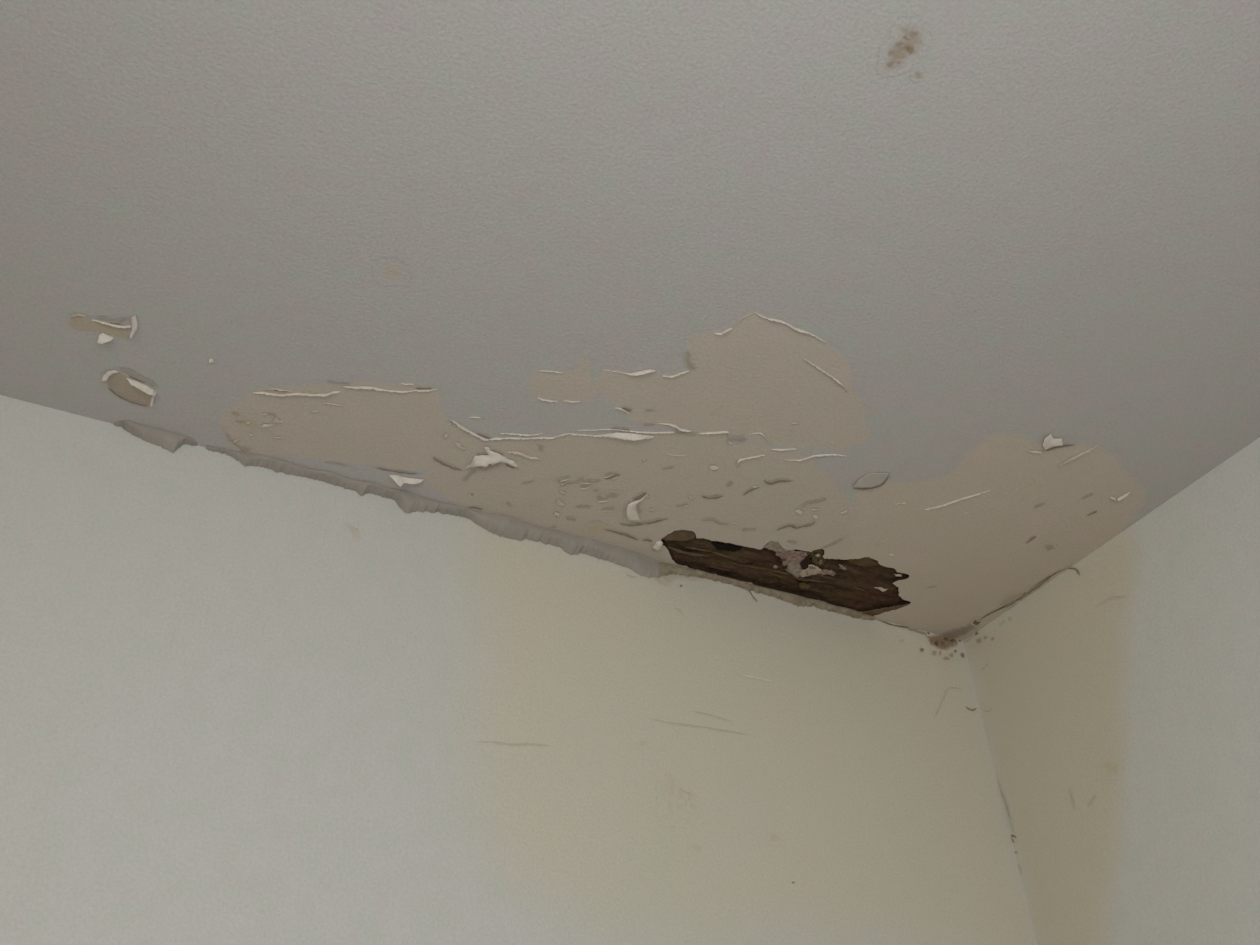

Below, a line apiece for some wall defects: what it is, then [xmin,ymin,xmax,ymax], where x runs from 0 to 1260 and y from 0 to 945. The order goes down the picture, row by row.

peeling [65,312,138,344]
peeling [101,368,157,408]
peeling [389,367,1154,641]